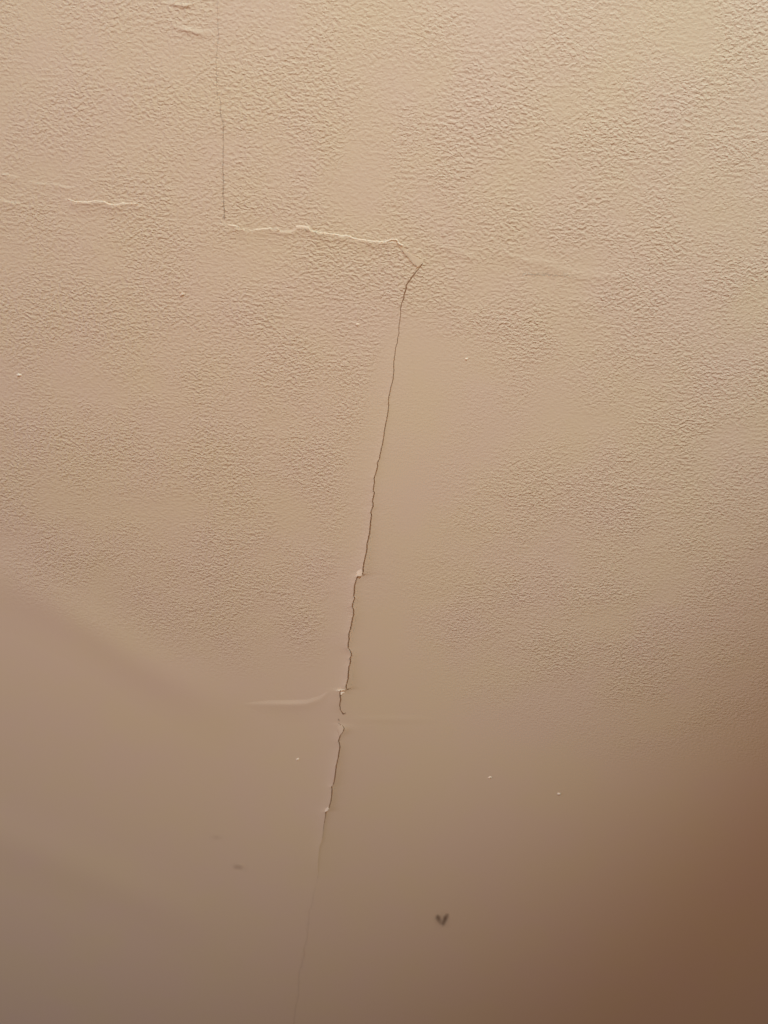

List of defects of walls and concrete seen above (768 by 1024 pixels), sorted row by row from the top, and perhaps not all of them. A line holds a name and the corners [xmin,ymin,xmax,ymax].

crack [219,223,397,257]